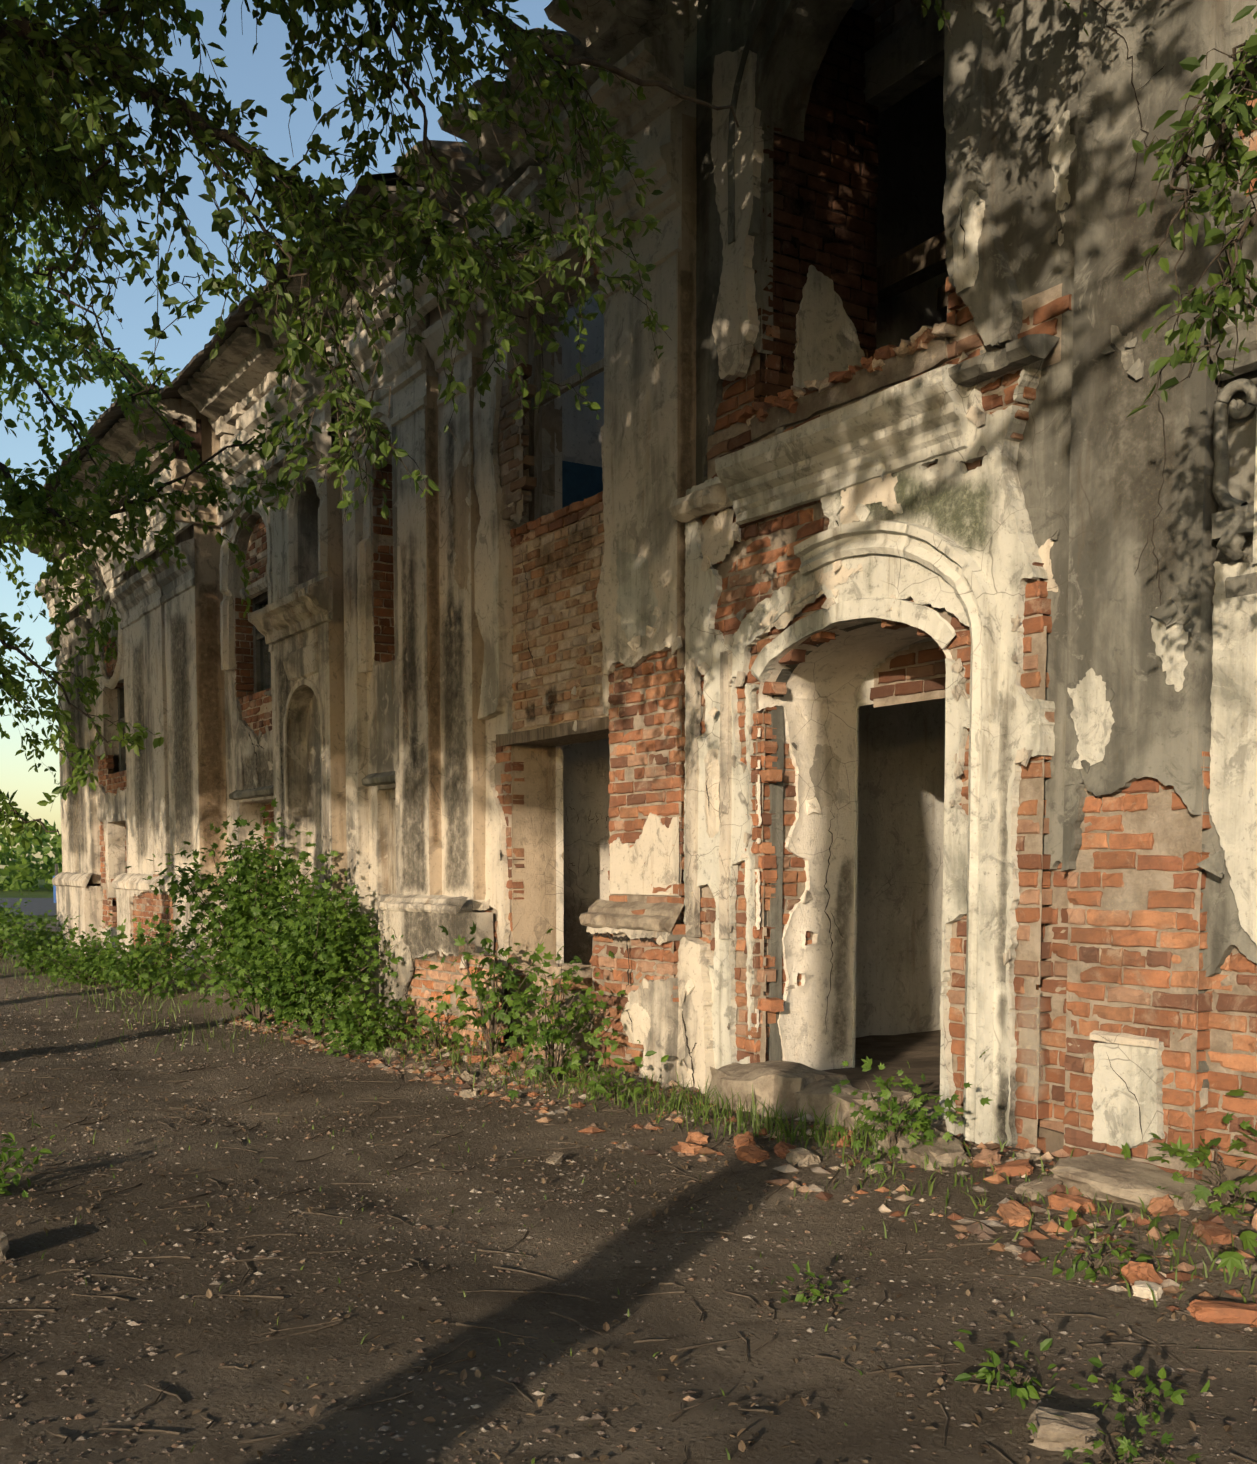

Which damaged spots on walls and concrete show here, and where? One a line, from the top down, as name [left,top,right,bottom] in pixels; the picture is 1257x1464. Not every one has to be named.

flaking render [955,296,974,326]
flaking render [706,324,786,434]
flaking render [966,370,1036,440]
flaking render [965,446,988,471]
flaking render [589,470,904,1073]
flaking render [972,529,1257,1180]
flaking render [946,914,967,1124]
crack [1107,1055,1143,1138]
spalling [1147,1194,1178,1217]